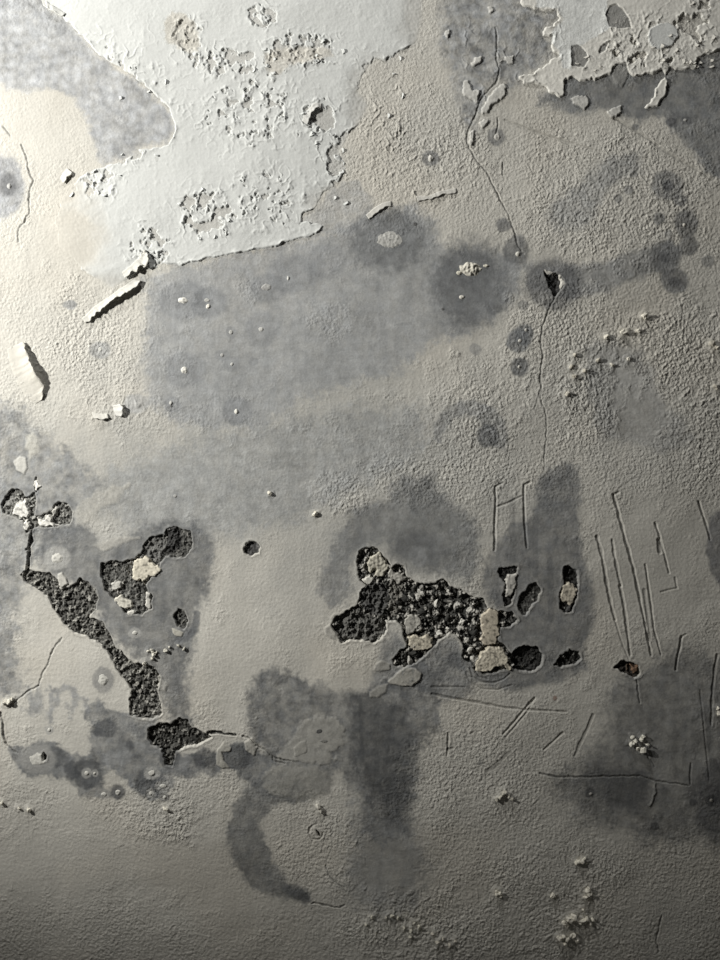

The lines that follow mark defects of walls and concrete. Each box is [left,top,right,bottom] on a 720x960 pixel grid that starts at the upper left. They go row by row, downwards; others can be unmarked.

leakage [0,0,175,168]
peeling [42,0,422,323]
crack [465,26,525,255]
leakage [428,0,720,183]
peeling [519,0,720,109]
crack [533,298,557,471]
crack [0,637,63,755]
spalling [0,480,74,536]
spalling [17,524,214,769]
leakage [0,146,701,932]
spalling [330,545,583,677]
spalling [611,658,644,680]